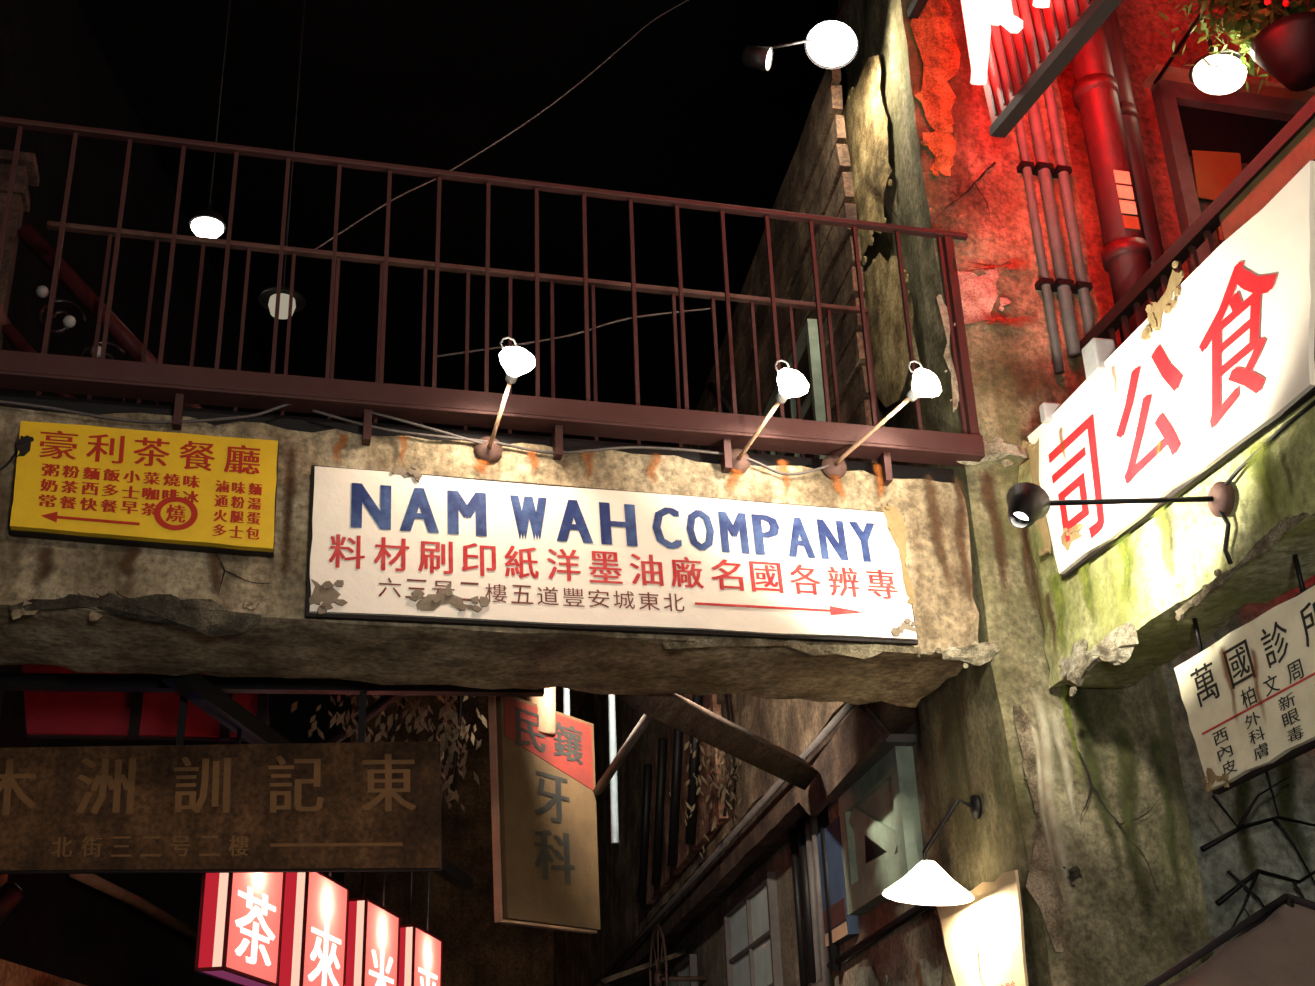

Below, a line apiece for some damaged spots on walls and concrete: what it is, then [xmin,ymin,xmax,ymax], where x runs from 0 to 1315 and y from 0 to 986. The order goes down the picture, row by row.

peeling [910,0,960,177]
corrosion [647,454,661,480]
corrosion [728,469,742,489]
corrosion [779,460,789,488]
corrosion [875,465,884,495]
leakage [1249,442,1292,509]
spalling [663,502,1000,669]
leakage [1117,536,1131,594]
leakage [1153,507,1169,571]
spalling [1058,622,1139,697]
leakage [1032,685,1149,914]
leakage [1151,735,1176,868]